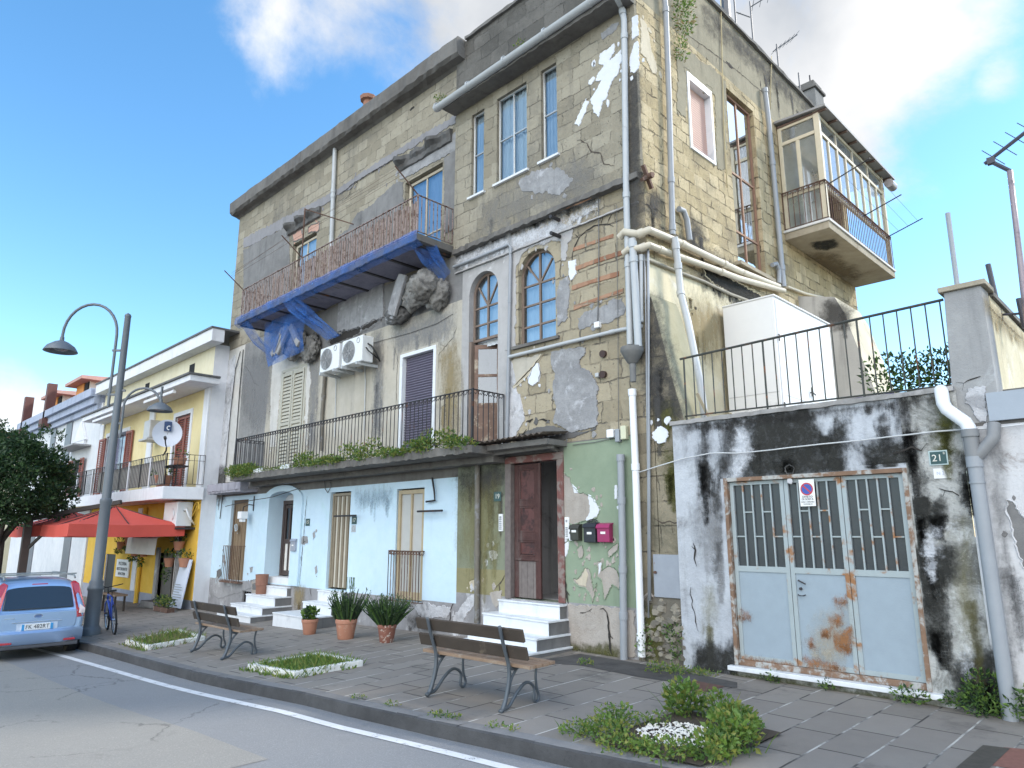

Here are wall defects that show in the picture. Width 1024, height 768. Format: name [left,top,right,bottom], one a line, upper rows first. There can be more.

peeling [575,60,596,126]
peeling [505,162,626,442]
spalling [564,468,603,525]
damp [687,397,956,670]
damp [940,422,974,516]
spalling [1002,495,1024,569]
peeling [565,537,686,667]
rust [804,597,852,671]